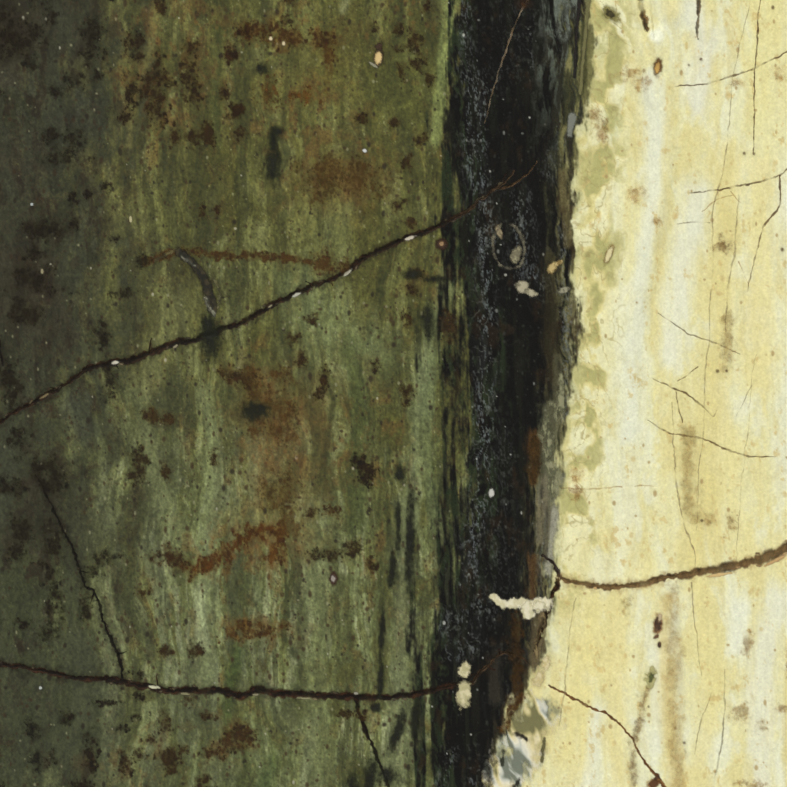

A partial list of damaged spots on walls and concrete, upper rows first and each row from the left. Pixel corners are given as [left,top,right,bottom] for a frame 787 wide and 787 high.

rust [117,42,217,147]
rust [221,84,245,117]
rust [234,15,336,63]
rust [394,23,427,80]
crack [679,0,787,152]
crack [694,181,760,193]
crack [759,169,787,241]
crack [0,161,537,424]
leakage [421,307,433,338]
crack [648,366,726,450]
rust [150,502,294,583]
crack [0,474,787,787]